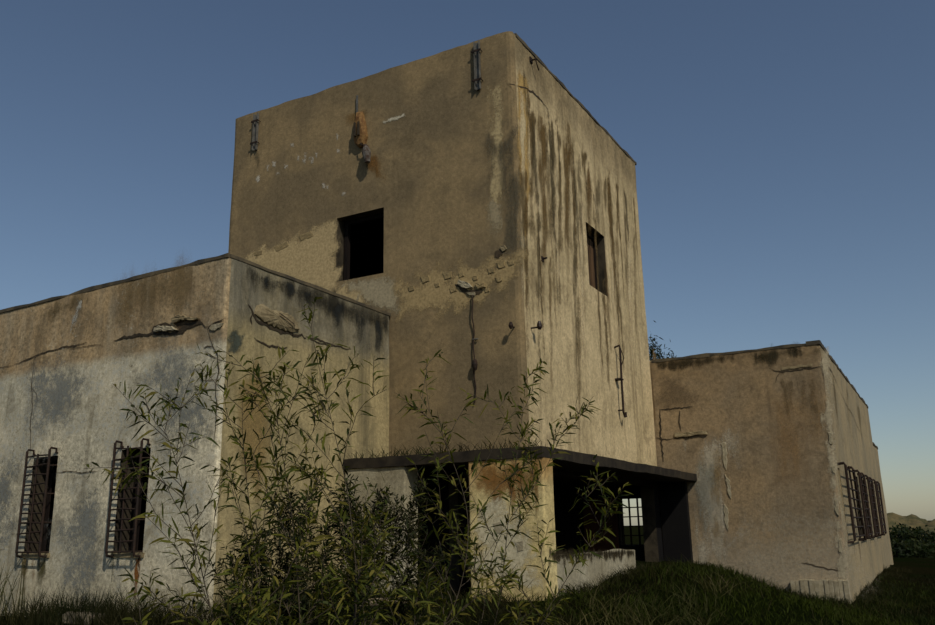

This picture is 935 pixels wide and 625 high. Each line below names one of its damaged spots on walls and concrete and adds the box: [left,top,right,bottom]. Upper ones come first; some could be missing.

flaking render [244,220,527,320]
water stain [488,74,638,381]
crack [0,342,93,448]
crack [195,332,220,437]
crack [658,406,707,457]
water stain [658,356,732,370]
water stain [755,346,801,364]